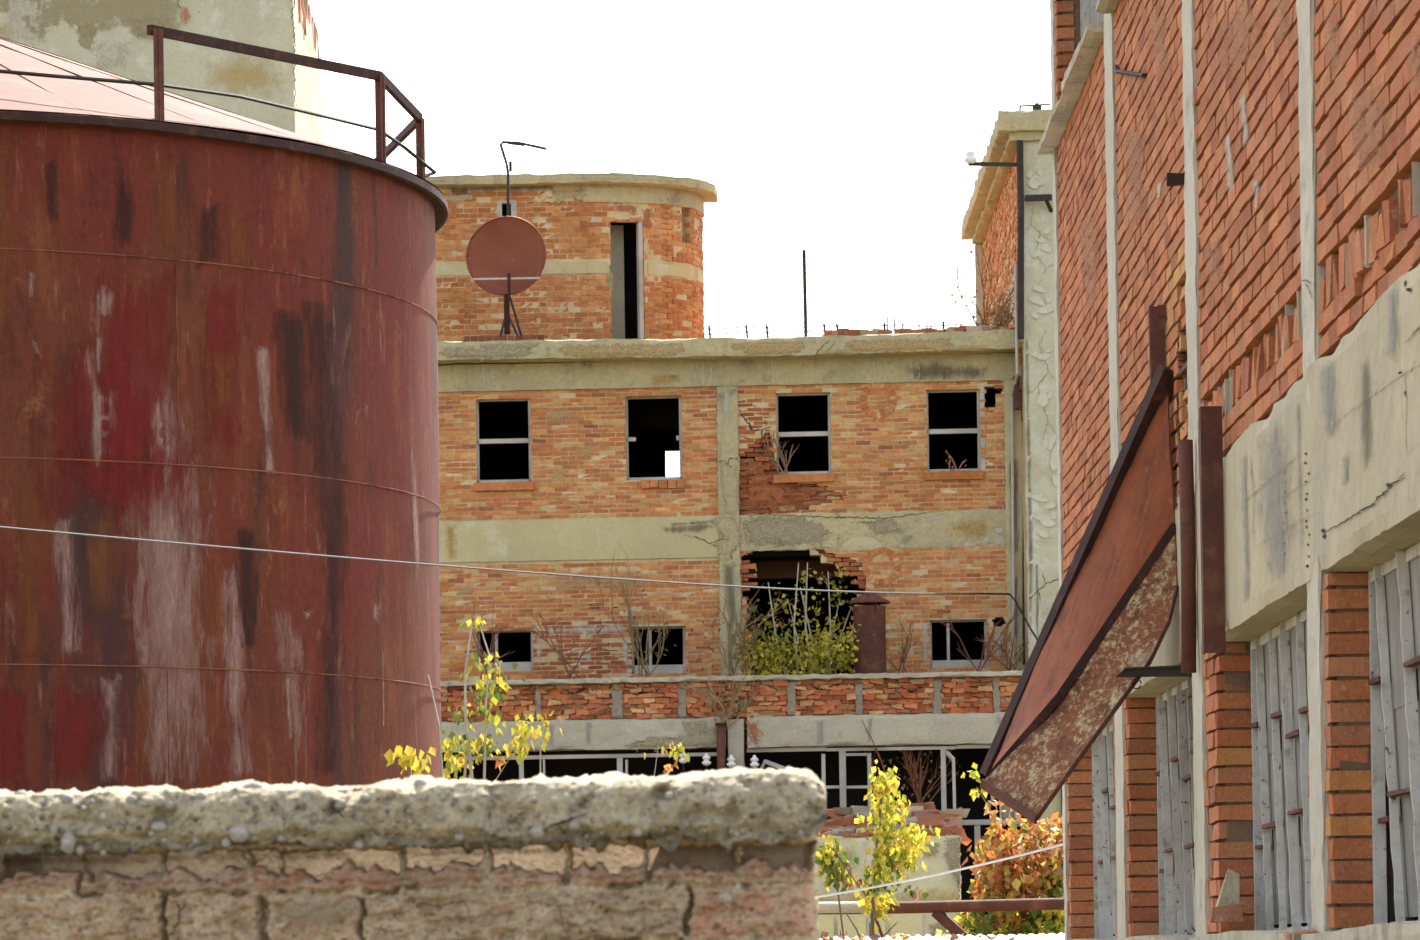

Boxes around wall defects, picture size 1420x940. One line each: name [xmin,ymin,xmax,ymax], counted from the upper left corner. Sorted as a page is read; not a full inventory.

peeling [0,0,191,70]
spalling [1200,162,1420,420]
crack [1322,472,1405,534]